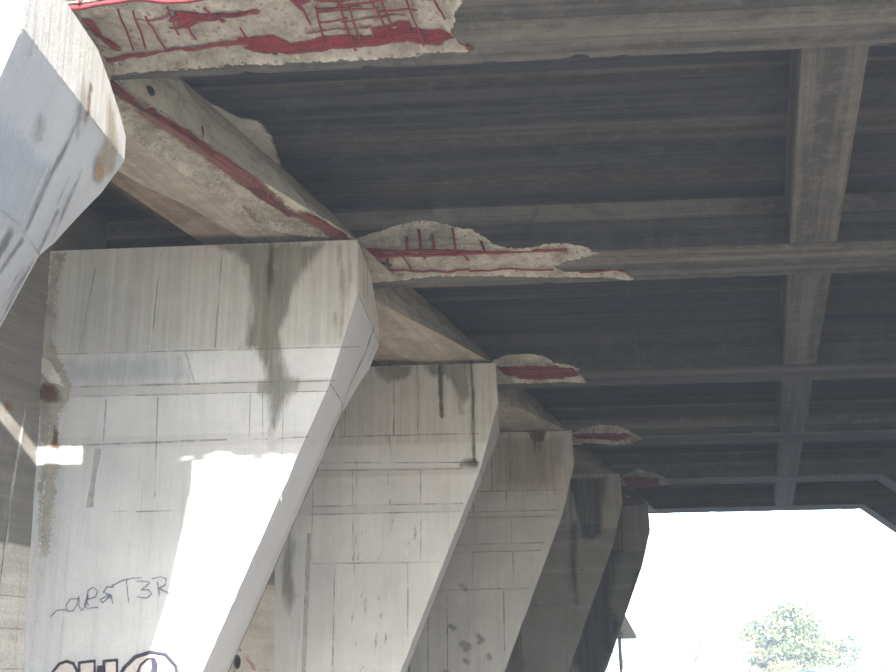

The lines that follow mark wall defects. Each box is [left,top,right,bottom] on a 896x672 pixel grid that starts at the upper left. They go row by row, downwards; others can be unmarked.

damp [79,83,93,122]
spalling [65,0,634,282]
damp [0,231,23,272]
damp [223,242,316,430]
spalling [493,354,586,384]
damp [425,361,477,467]
spalling [572,424,644,445]